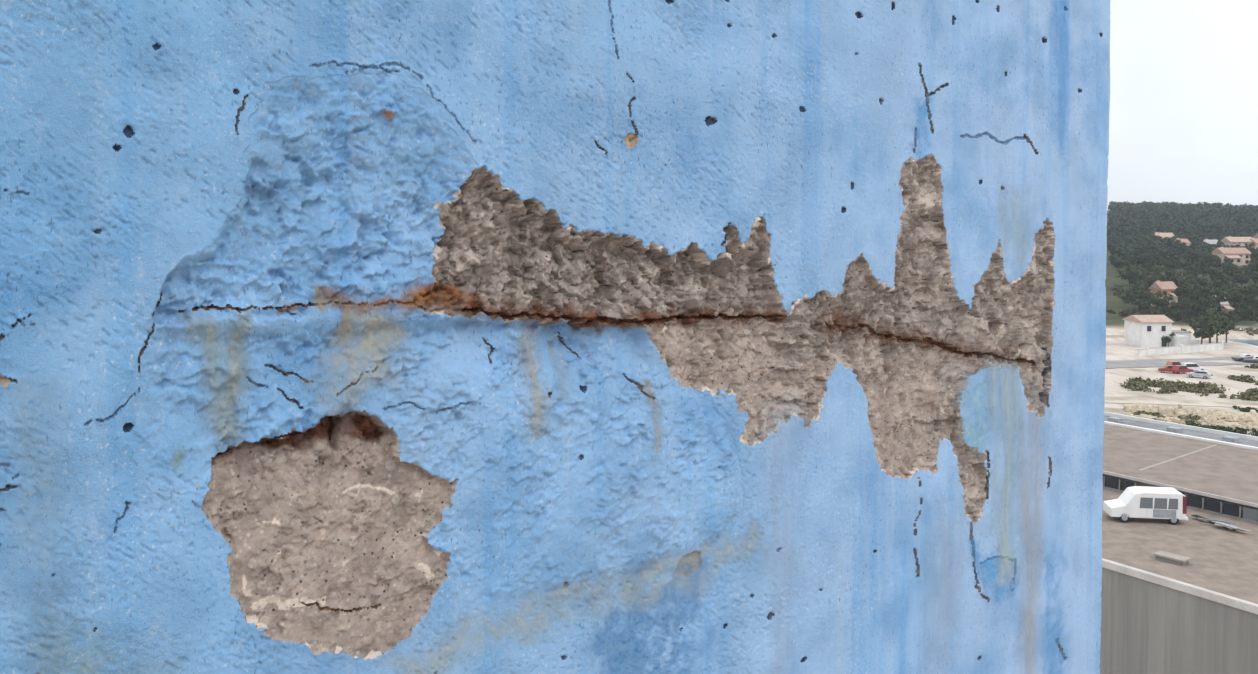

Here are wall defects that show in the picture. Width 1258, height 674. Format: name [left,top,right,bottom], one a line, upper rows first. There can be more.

crack [309,60,477,144]
crack [913,63,1038,155]
crack [0,375,18,388]
crack [0,313,34,340]
crack [84,293,425,426]
crack [482,338,495,364]
rust [321,287,716,329]
spalling [152,71,1055,524]
rust [757,312,786,324]
crack [113,501,131,534]
spalling [201,410,459,661]
crack [913,478,923,577]